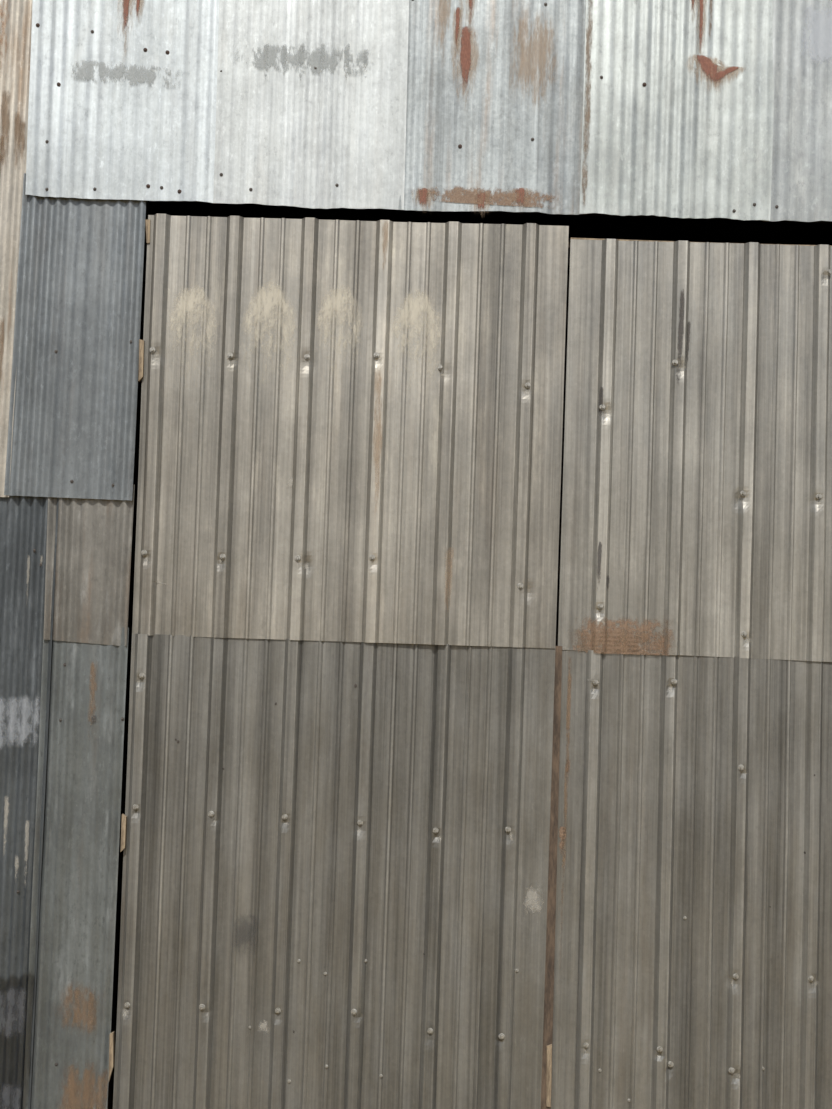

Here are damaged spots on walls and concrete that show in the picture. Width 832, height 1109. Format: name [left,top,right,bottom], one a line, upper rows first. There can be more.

rust [123,0,140,25]
rust [456,0,473,84]
rust [692,0,738,81]
rust [419,187,554,208]
rust [577,620,670,655]